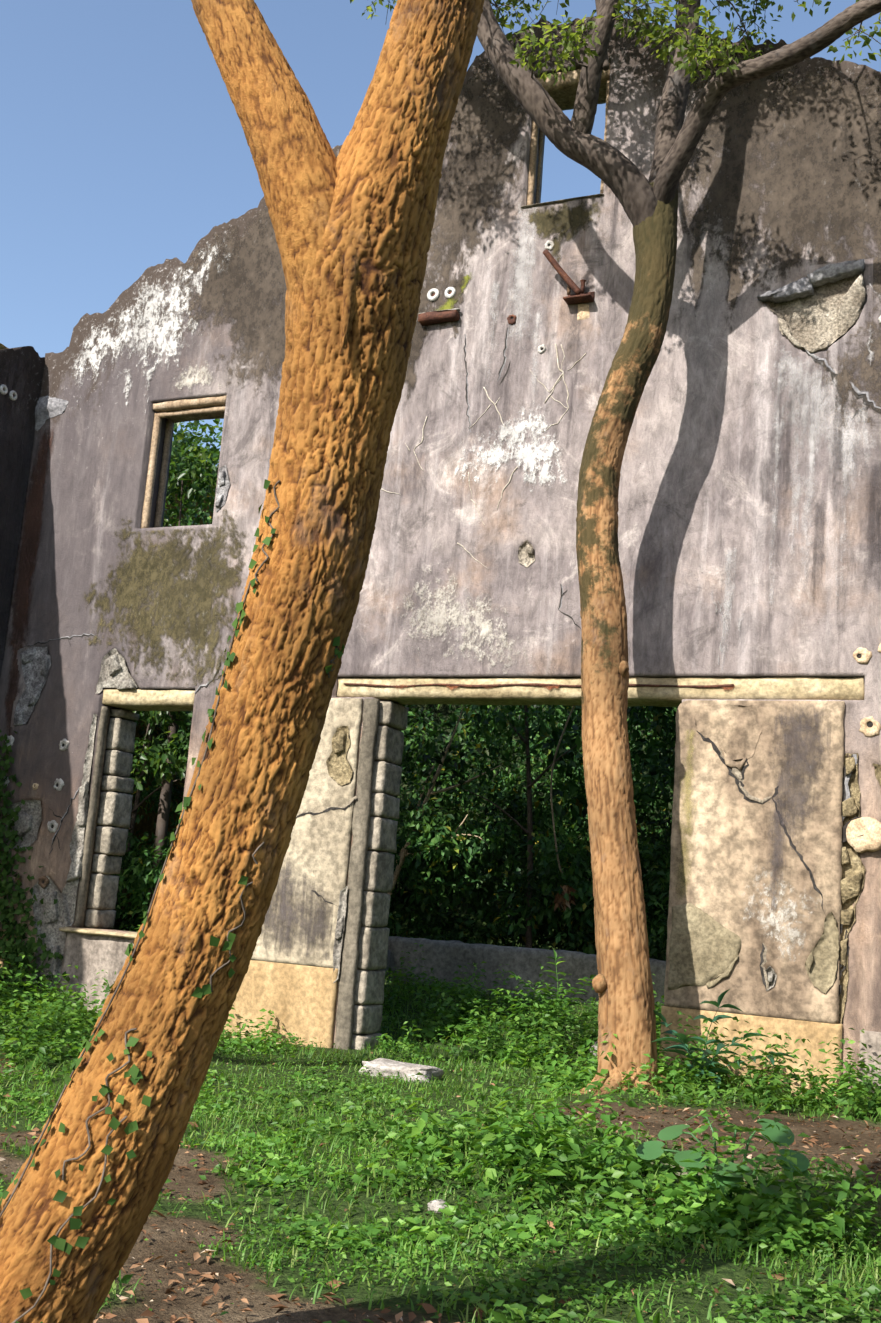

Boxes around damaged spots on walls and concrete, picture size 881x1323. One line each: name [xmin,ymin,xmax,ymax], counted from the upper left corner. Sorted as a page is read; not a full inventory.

leakage [688,44,767,113]
leakage [74,204,287,405]
leakage [678,65,881,479]
efflorescence [455,407,565,483]
leakage [867,466,881,563]
peeling [13,646,51,726]
crack [842,754,857,822]
crack [697,731,850,1012]